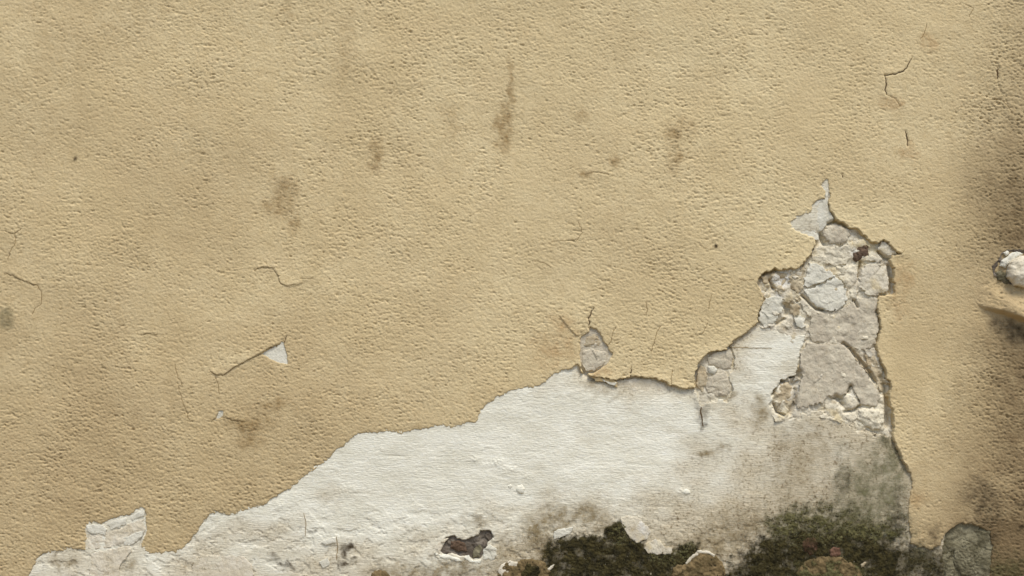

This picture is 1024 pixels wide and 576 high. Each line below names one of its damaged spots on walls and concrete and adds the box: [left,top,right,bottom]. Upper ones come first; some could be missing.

flaking render [992,249,1024,288]
peeling [28,179,993,576]
damp [527,506,596,560]